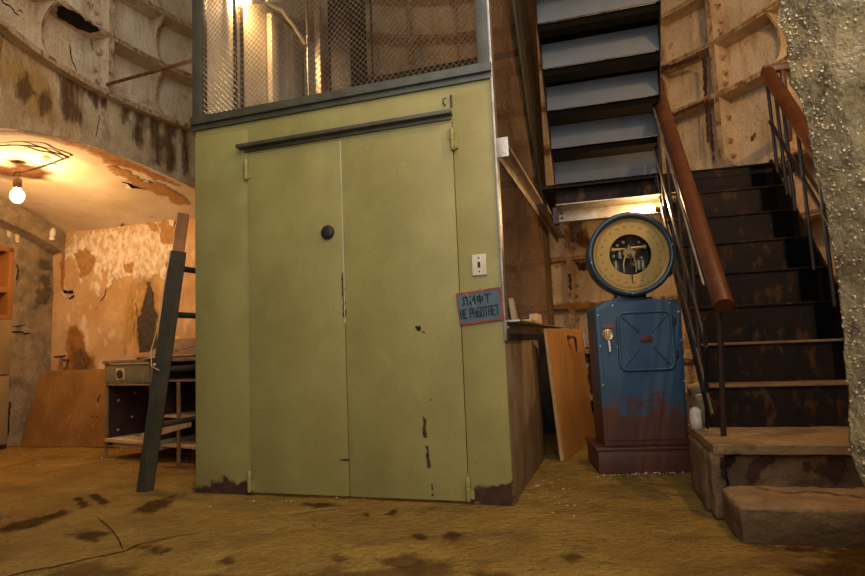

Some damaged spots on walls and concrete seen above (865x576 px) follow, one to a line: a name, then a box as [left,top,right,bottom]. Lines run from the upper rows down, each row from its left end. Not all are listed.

spalling [55,6,100,33]
leakage [0,37,107,124]
leakage [0,163,52,179]
peeling [103,162,189,206]
peeling [62,220,176,299]
leakage [123,282,160,354]
rust [423,417,431,468]
rust [192,476,251,495]
rust [470,481,515,506]
crack [9,519,196,576]